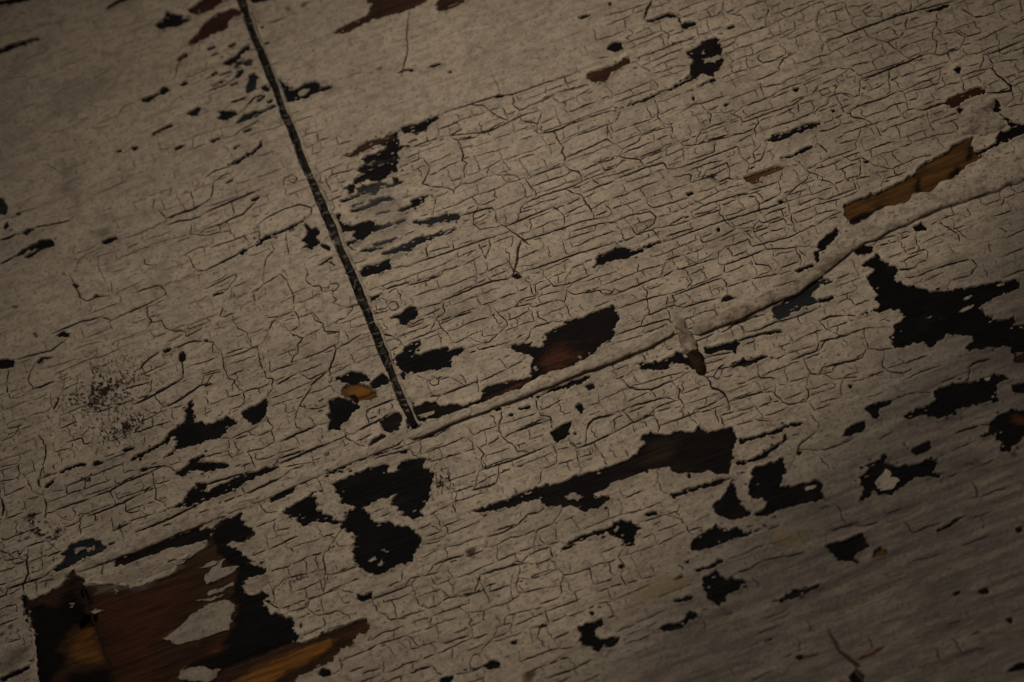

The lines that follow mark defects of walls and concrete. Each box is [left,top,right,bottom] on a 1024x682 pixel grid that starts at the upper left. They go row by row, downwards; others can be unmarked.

peeling [240,115,461,279]
peeling [370,305,620,446]
crack [0,0,1024,503]
peeling [854,246,1024,363]
crack [0,436,206,598]
peeling [0,513,370,682]
crack [254,503,360,635]
peeling [263,449,435,575]
crack [331,259,941,682]
peeling [472,422,825,606]
crack [696,602,1024,682]
crack [886,424,1024,588]